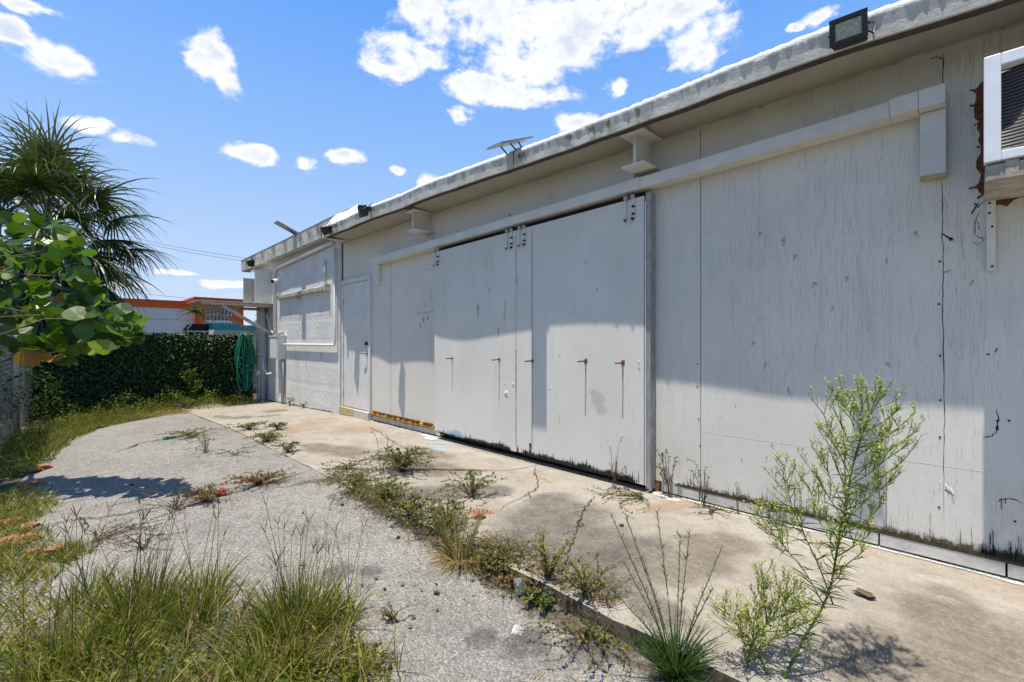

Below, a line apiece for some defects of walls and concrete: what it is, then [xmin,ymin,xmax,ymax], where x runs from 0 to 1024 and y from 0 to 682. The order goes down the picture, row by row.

crack [941,181,986,496]
water stain [438,430,639,483]
crack [557,496,595,574]
water stain [960,528,1024,564]